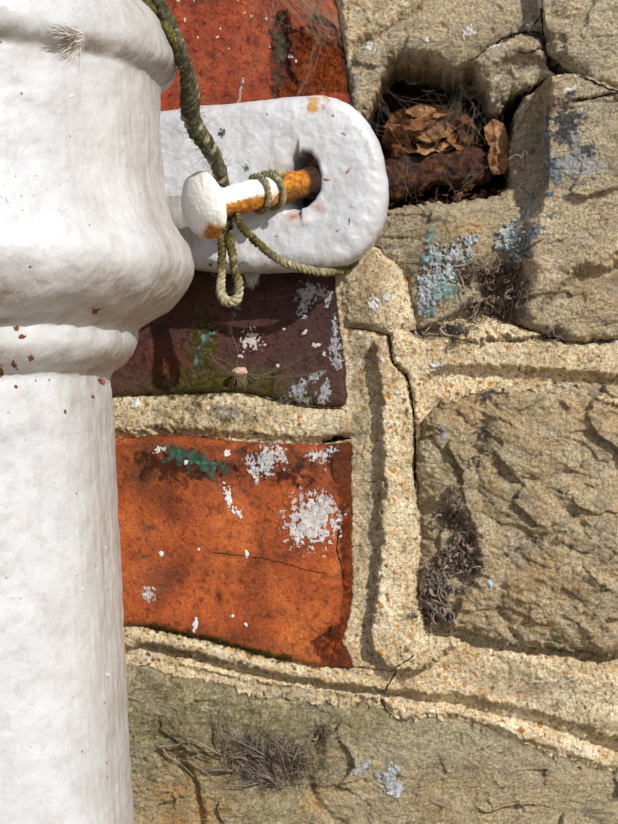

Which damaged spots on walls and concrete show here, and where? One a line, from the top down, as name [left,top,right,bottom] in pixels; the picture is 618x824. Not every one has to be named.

crack [475,8,618,107]